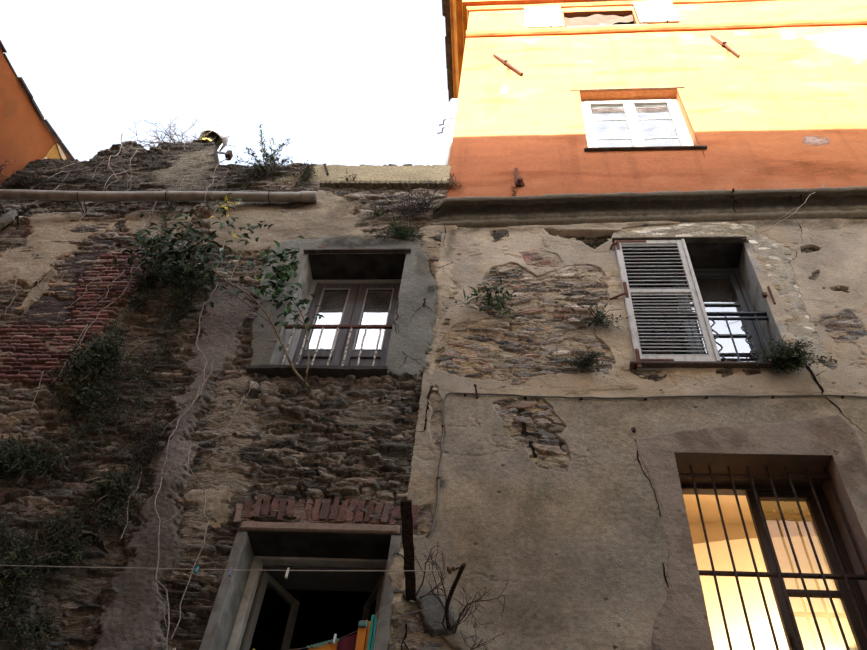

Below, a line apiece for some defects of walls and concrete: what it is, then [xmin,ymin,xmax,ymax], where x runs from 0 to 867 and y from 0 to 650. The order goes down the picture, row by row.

peeling [0,190,398,314]
peeling [42,332,73,354]
spalling [414,225,667,391]
spalling [556,220,867,369]
crack [418,397,430,432]
spalling [493,398,570,472]
crack [804,365,865,433]
crack [634,439,661,516]